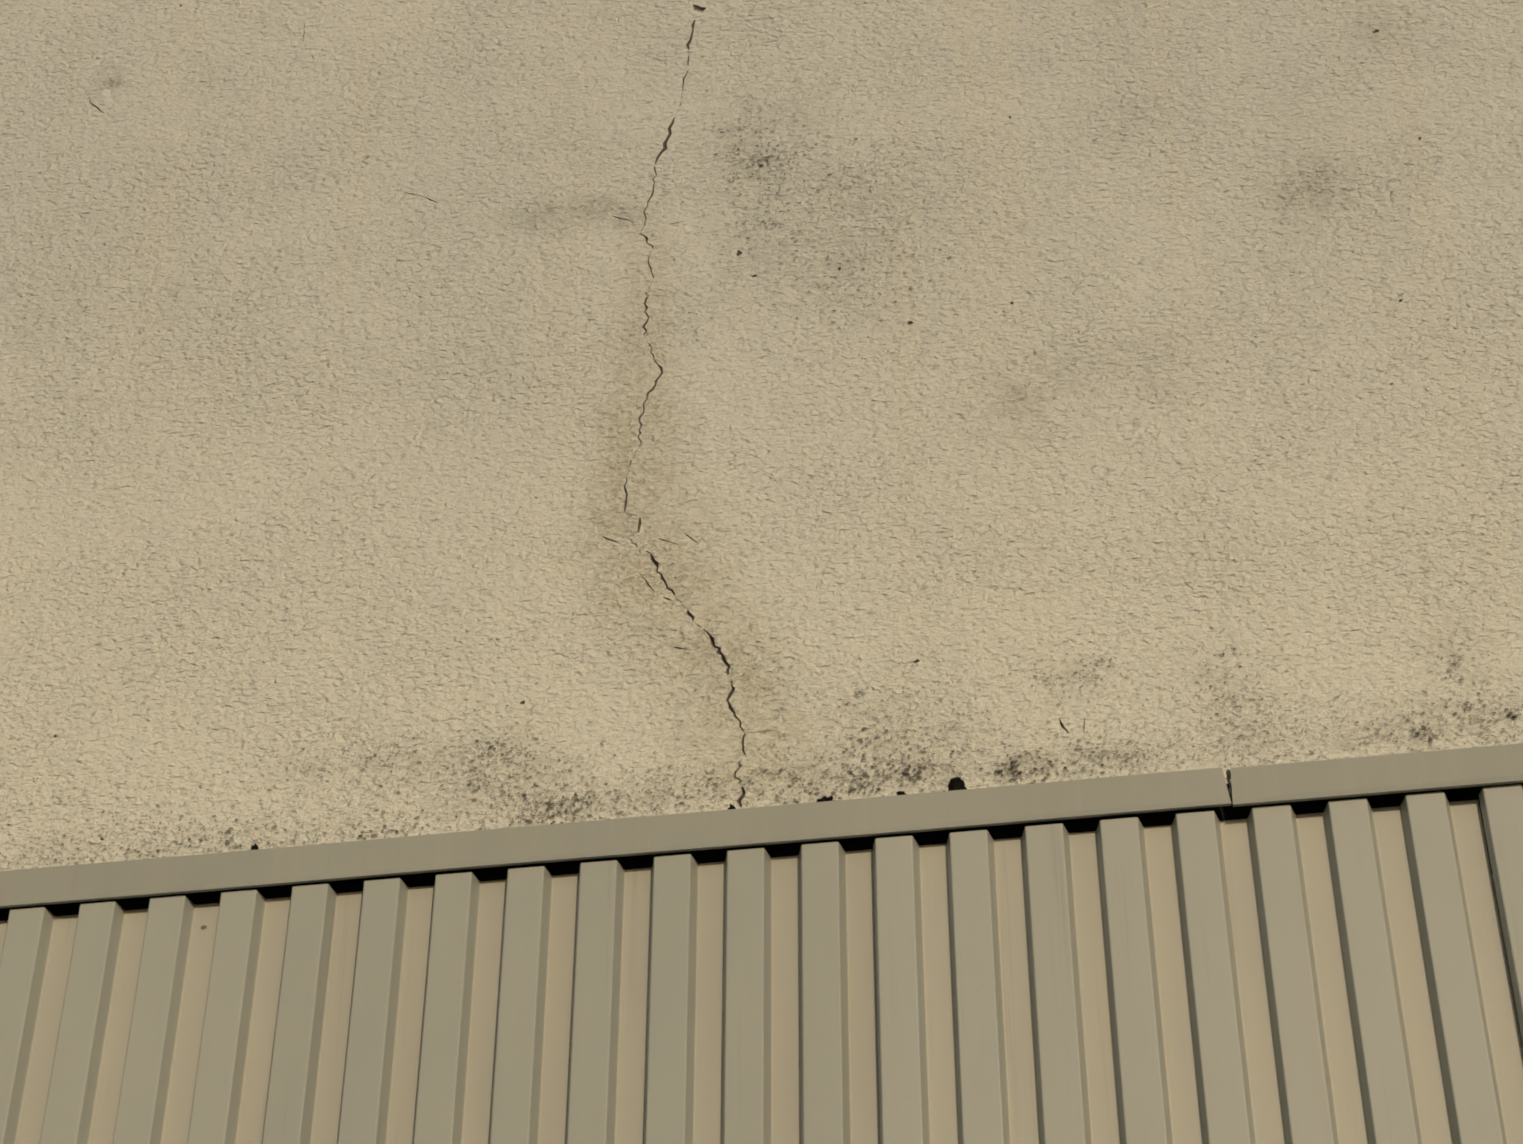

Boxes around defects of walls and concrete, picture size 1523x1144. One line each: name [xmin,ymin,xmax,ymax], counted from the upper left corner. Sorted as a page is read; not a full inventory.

crack [602,4,772,808]
damp [0,671,1175,868]
damp [1197,650,1307,767]
mould [1372,638,1523,750]